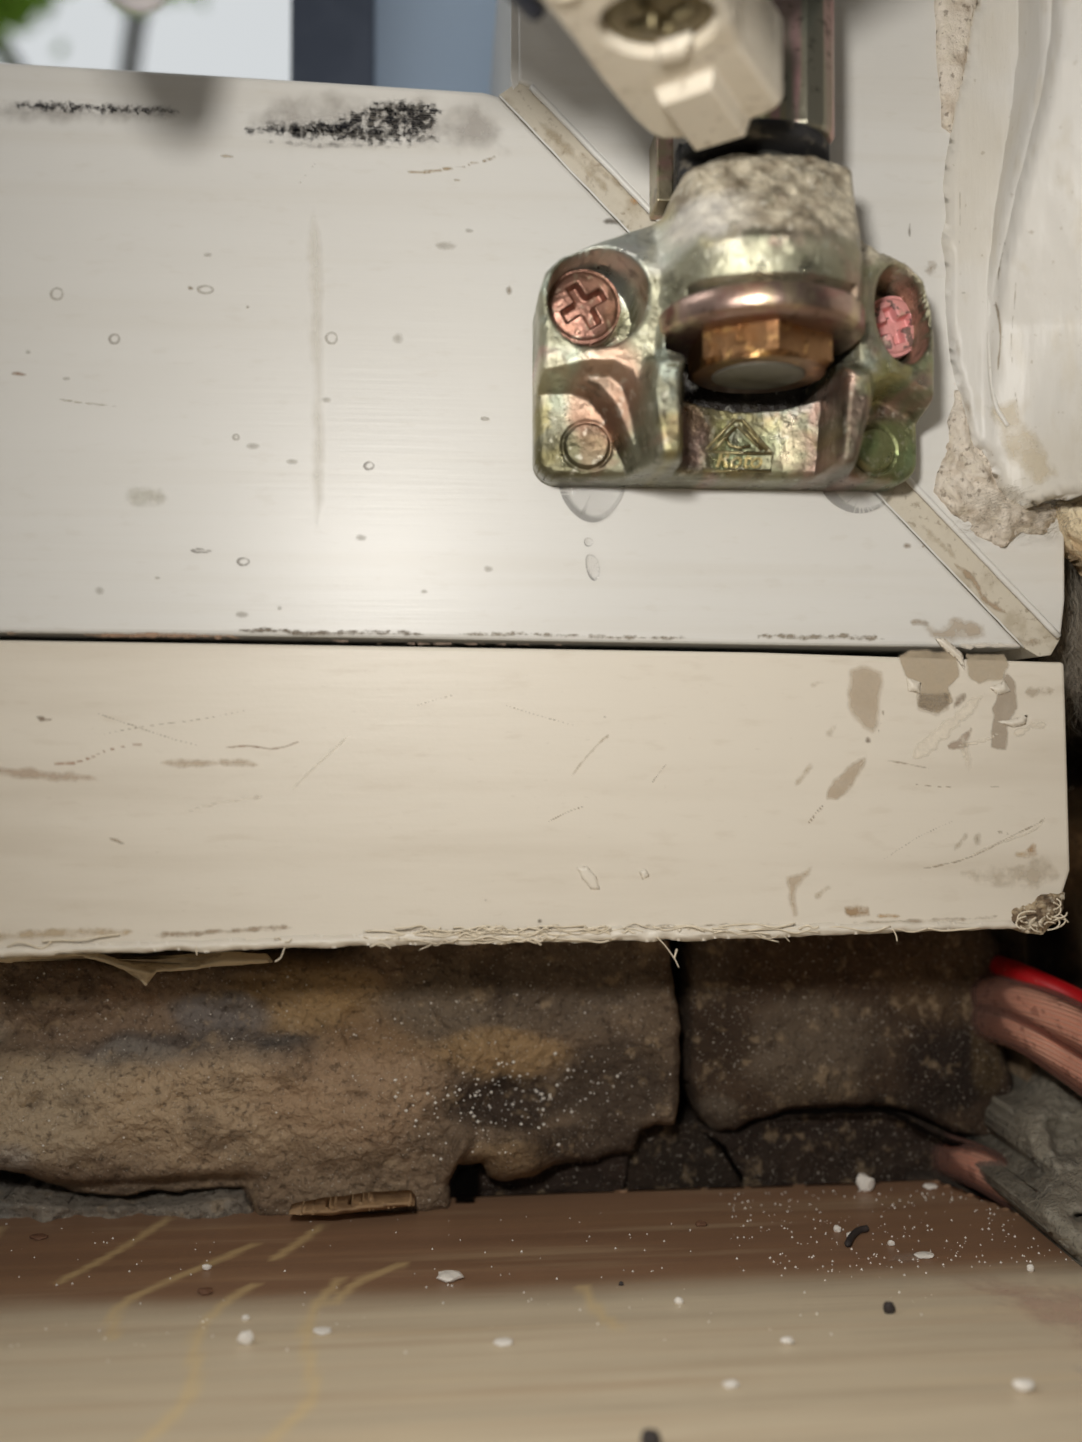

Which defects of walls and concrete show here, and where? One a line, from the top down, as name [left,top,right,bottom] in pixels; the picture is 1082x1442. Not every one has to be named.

leakage [17,103,173,114]
peeling [935,638,965,670]
peeling [948,732,969,749]